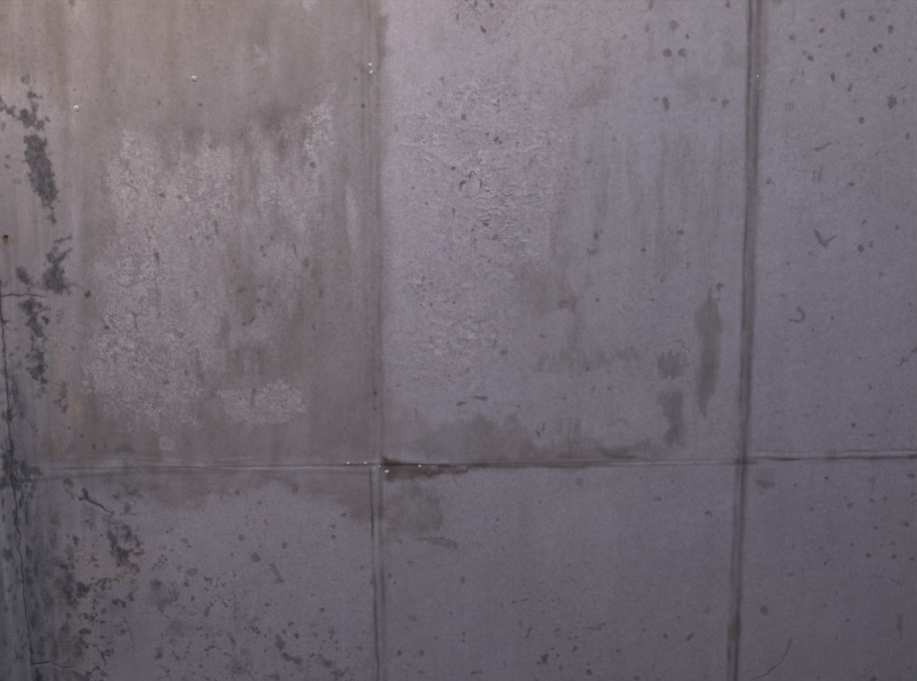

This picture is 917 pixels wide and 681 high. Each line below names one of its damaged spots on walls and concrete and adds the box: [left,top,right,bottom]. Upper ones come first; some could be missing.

crack [0,268,74,668]
leakage [499,0,799,681]